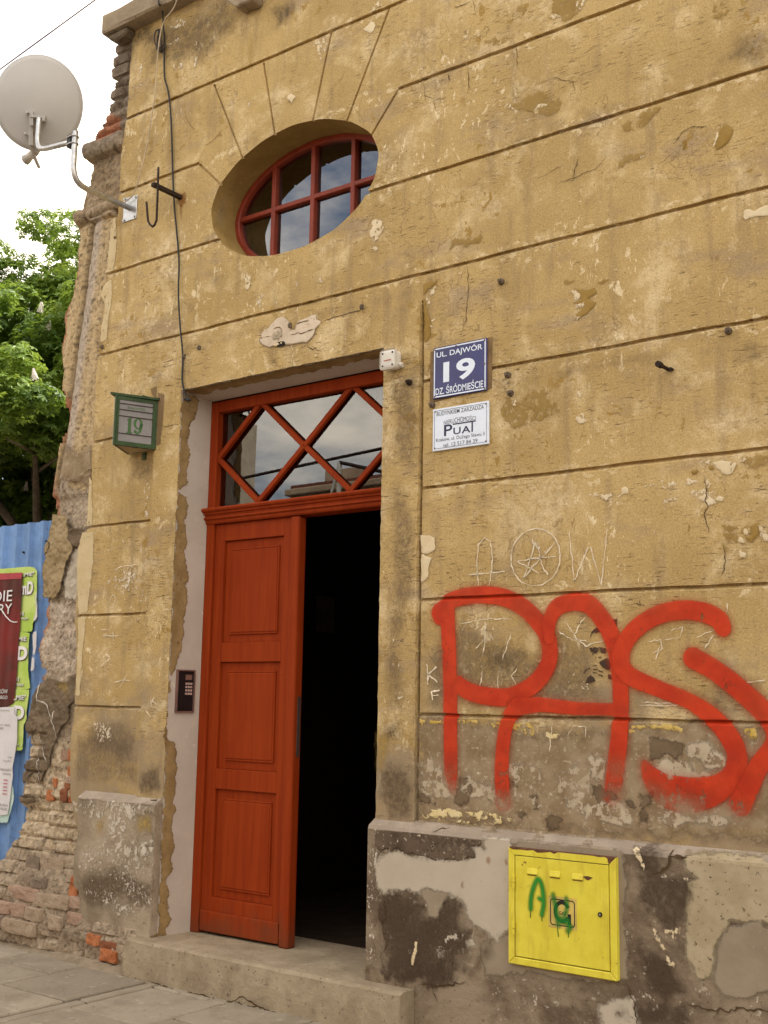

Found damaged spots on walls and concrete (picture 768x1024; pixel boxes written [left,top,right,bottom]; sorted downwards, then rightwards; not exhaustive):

peeling [551,0,586,22]
peeling [505,90,562,133]
peeling [713,125,733,150]
spalling [259,281,321,348]
peeling [168,350,382,692]
crack [704,480,726,575]
peeling [721,522,768,558]
flaking render [19,674,76,803]
peeling [139,714,178,937]
spalling [413,714,768,981]